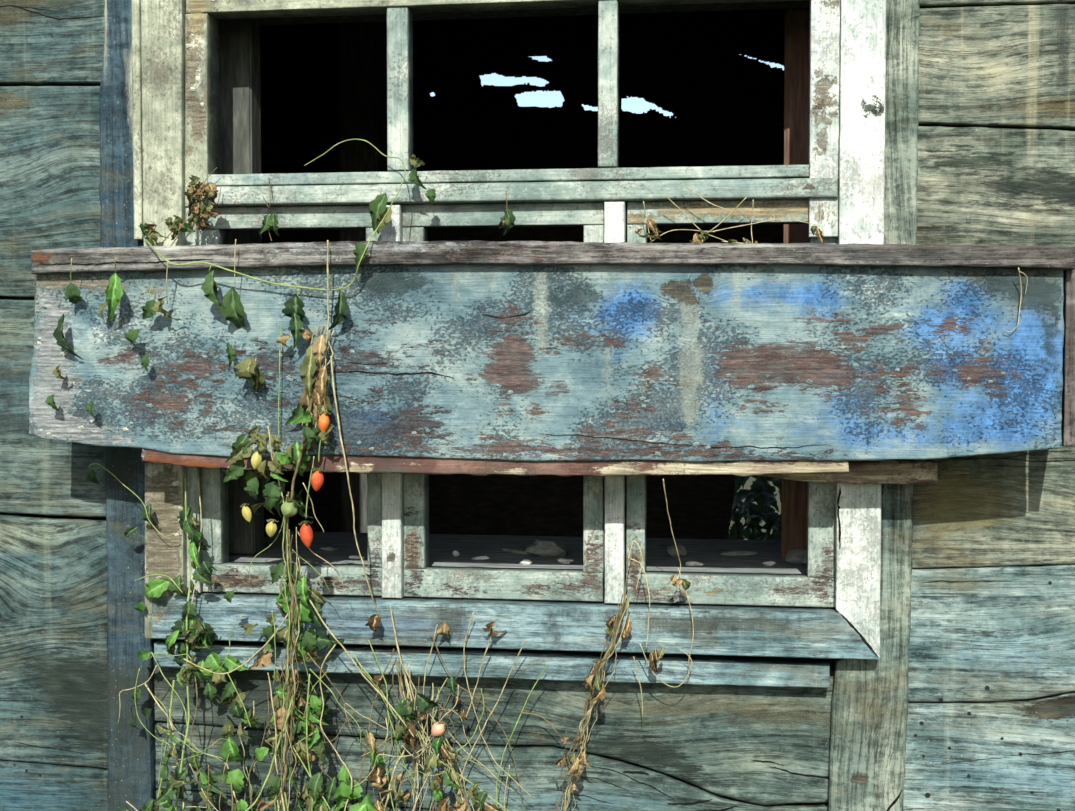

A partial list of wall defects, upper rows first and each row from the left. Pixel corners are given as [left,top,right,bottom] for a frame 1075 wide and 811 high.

peeling [810,69,840,155]
peeling [320,301,749,466]
peeling [711,308,1023,435]
peeling [29,273,304,585]
peeling [205,566,287,593]
crack [551,762,737,811]
crack [752,760,831,807]
crack [886,789,903,811]